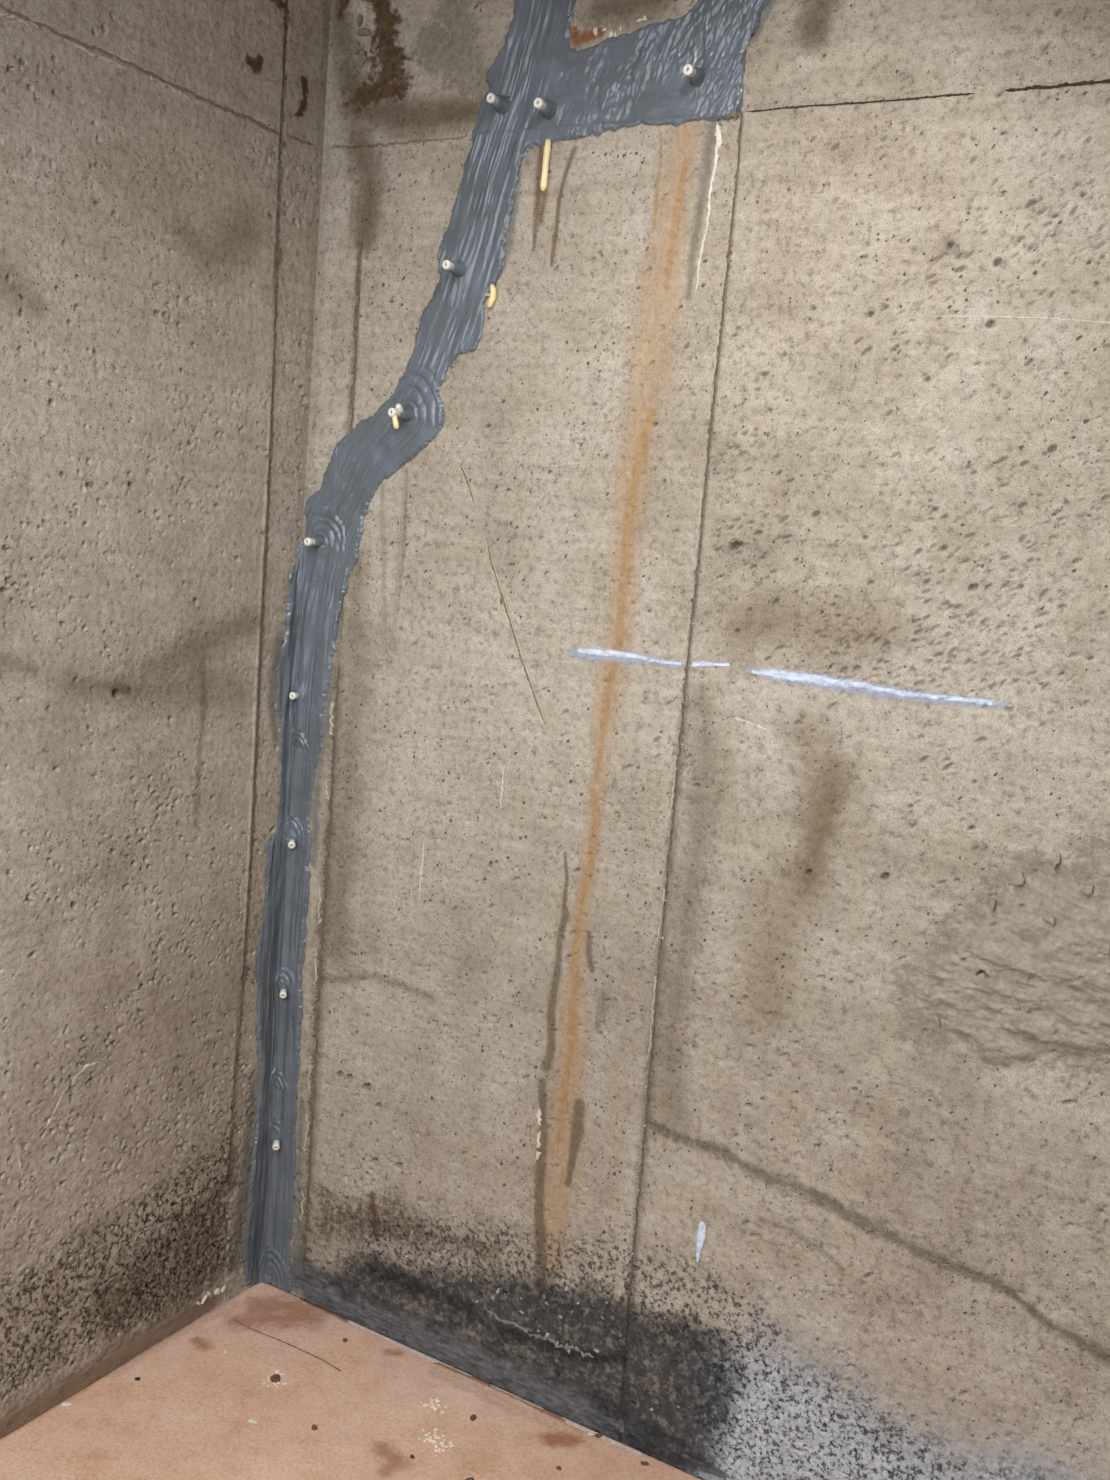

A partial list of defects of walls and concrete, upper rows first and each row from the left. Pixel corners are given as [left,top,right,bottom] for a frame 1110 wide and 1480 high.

water stain [0,1138,237,1385]
water stain [335,1212,1062,1480]
crack [650,1123,1110,1362]